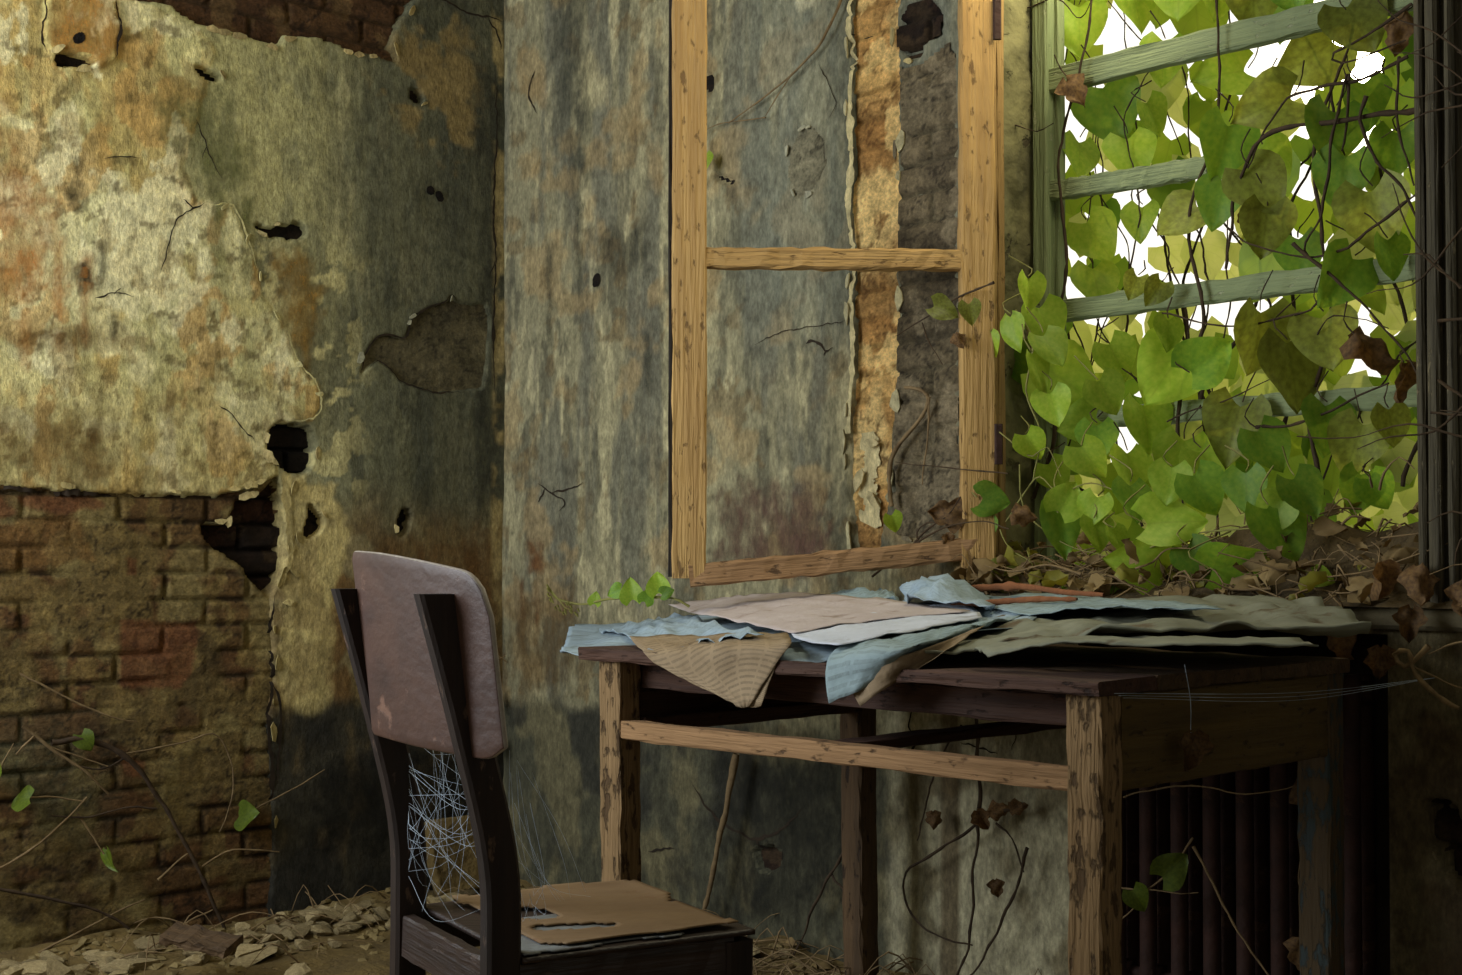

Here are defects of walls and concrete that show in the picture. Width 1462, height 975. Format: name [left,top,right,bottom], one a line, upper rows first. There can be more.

crack [40,0,48,51]
crack [115,1,123,59]
flaking render [136,0,416,62]
flaking render [843,0,959,250]
crack [160,117,224,273]
flaking render [212,202,302,281]
flaking render [840,270,960,549]
flaking render [303,508,328,537]
flaking render [0,311,324,952]